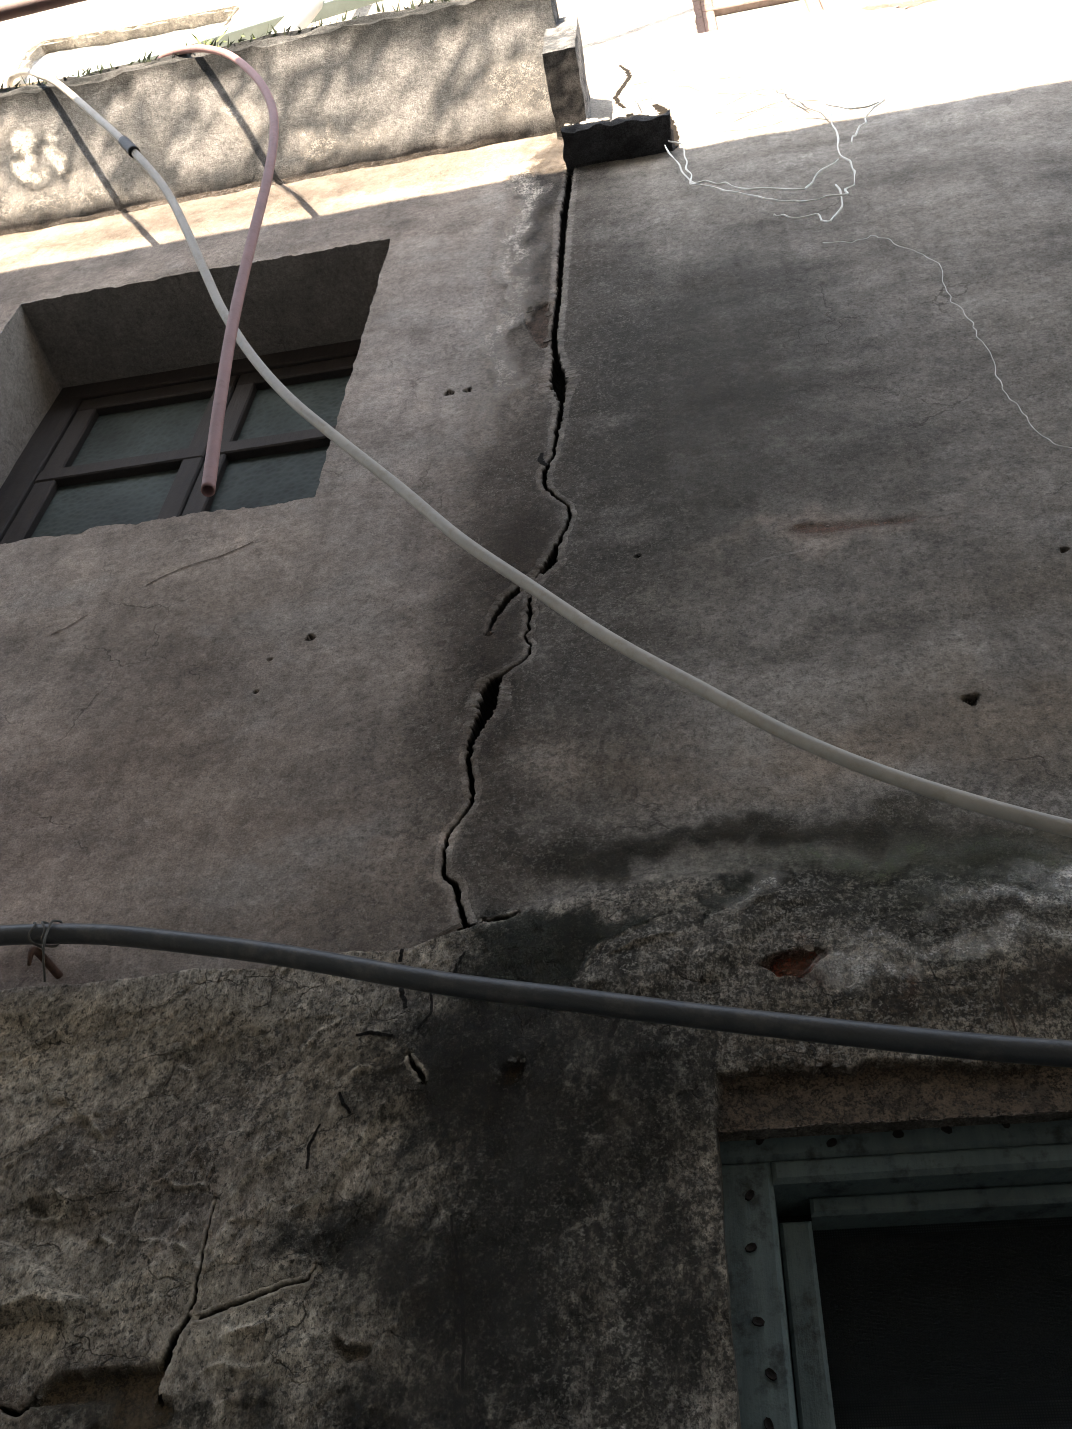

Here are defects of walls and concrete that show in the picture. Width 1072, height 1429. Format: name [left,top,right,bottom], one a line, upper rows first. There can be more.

crack [613,65,680,148]
crack [356,165,581,1085]
leakage [986,846,1072,903]
leakage [462,909,662,987]
spalling [763,944,828,978]
leakage [835,951,901,986]
crack [305,1092,352,1169]
leakage [346,997,617,1429]
crack [150,1199,322,1408]
crack [0,1394,41,1422]